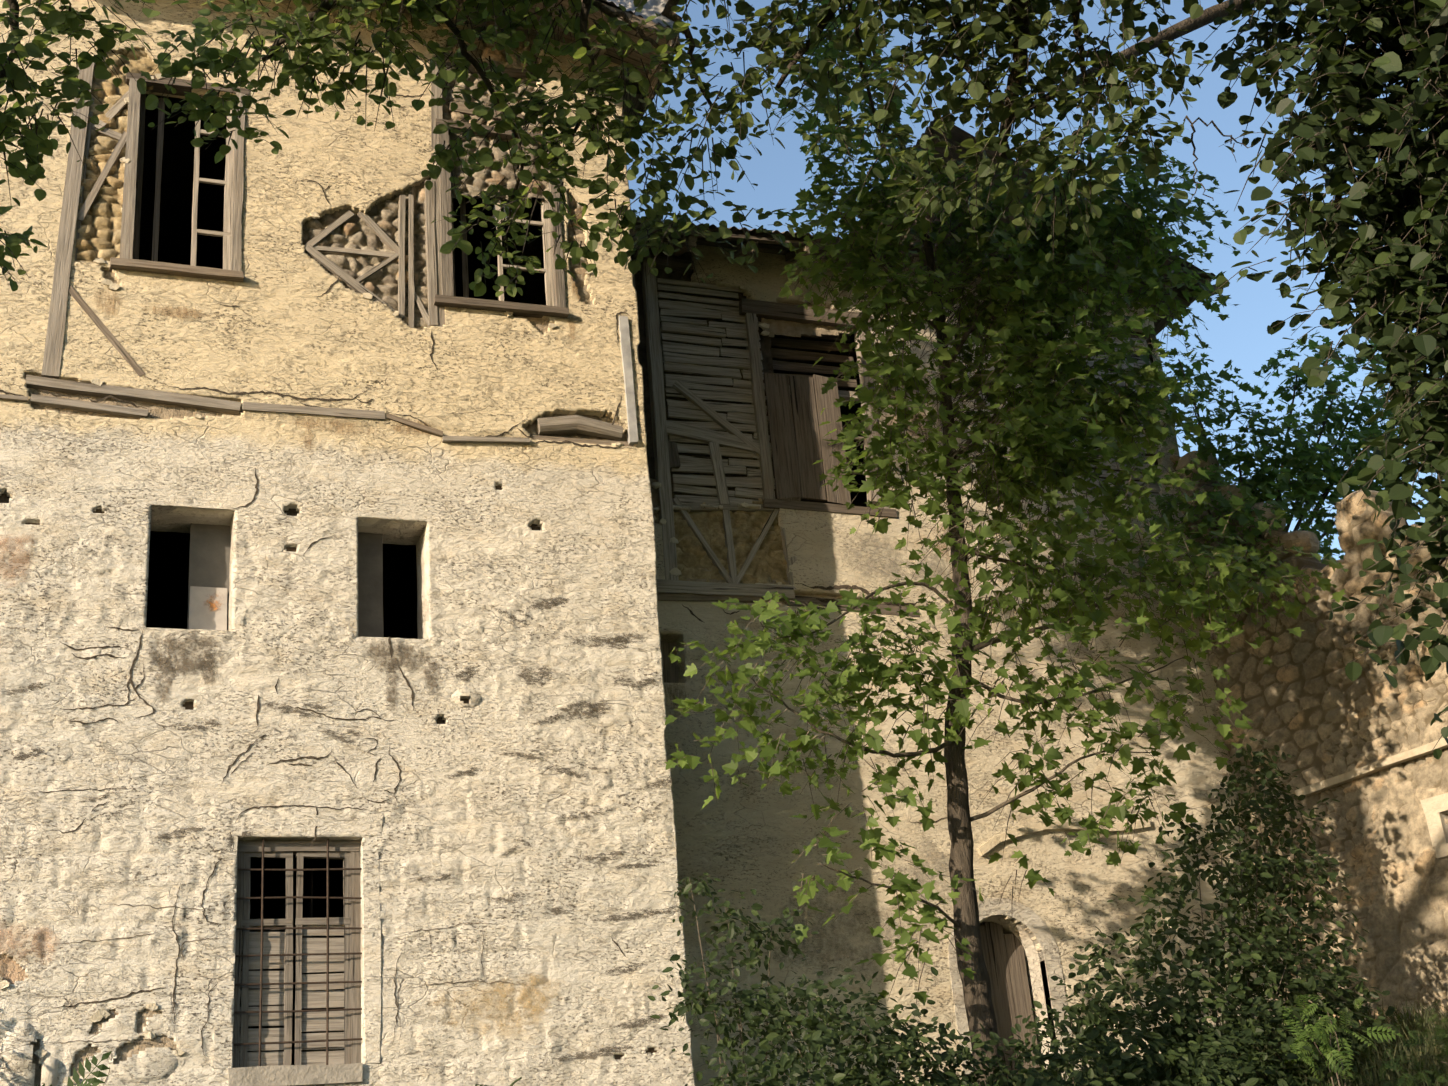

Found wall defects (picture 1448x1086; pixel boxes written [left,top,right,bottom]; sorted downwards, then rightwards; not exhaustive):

spalling [76,48,165,291]
spalling [303,24,549,329]
crack [0,383,445,437]
crack [479,396,628,449]
spalling [525,247,853,605]
crack [56,626,155,724]
damp [149,631,221,703]
damp [367,641,439,704]
crack [222,637,414,846]
crack [32,858,226,1056]
spalling [30,1041,48,1086]
spalling [64,1003,185,1084]